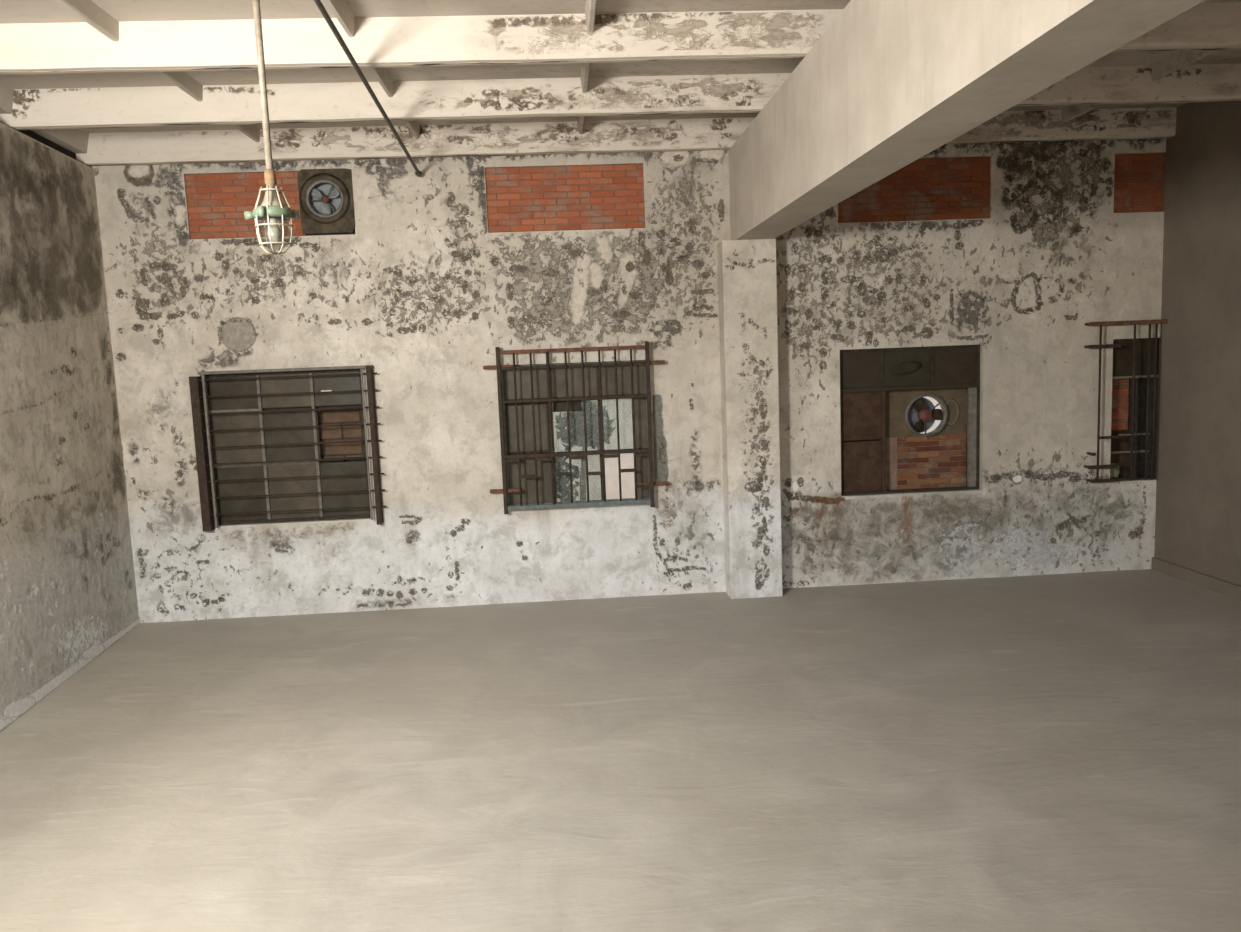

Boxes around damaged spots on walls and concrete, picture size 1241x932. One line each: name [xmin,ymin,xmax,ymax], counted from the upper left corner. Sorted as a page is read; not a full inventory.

peeling [488,12,820,54]
peeling [968,110,1170,137]
water stain [0,130,102,322]
peeling [116,165,341,345]
peeling [739,313,842,590]
peeling [986,464,1109,487]
spalling [399,515,422,544]
peeling [1050,513,1108,566]
peeling [136,548,168,615]
peeling [190,593,229,607]
peeling [322,576,427,608]